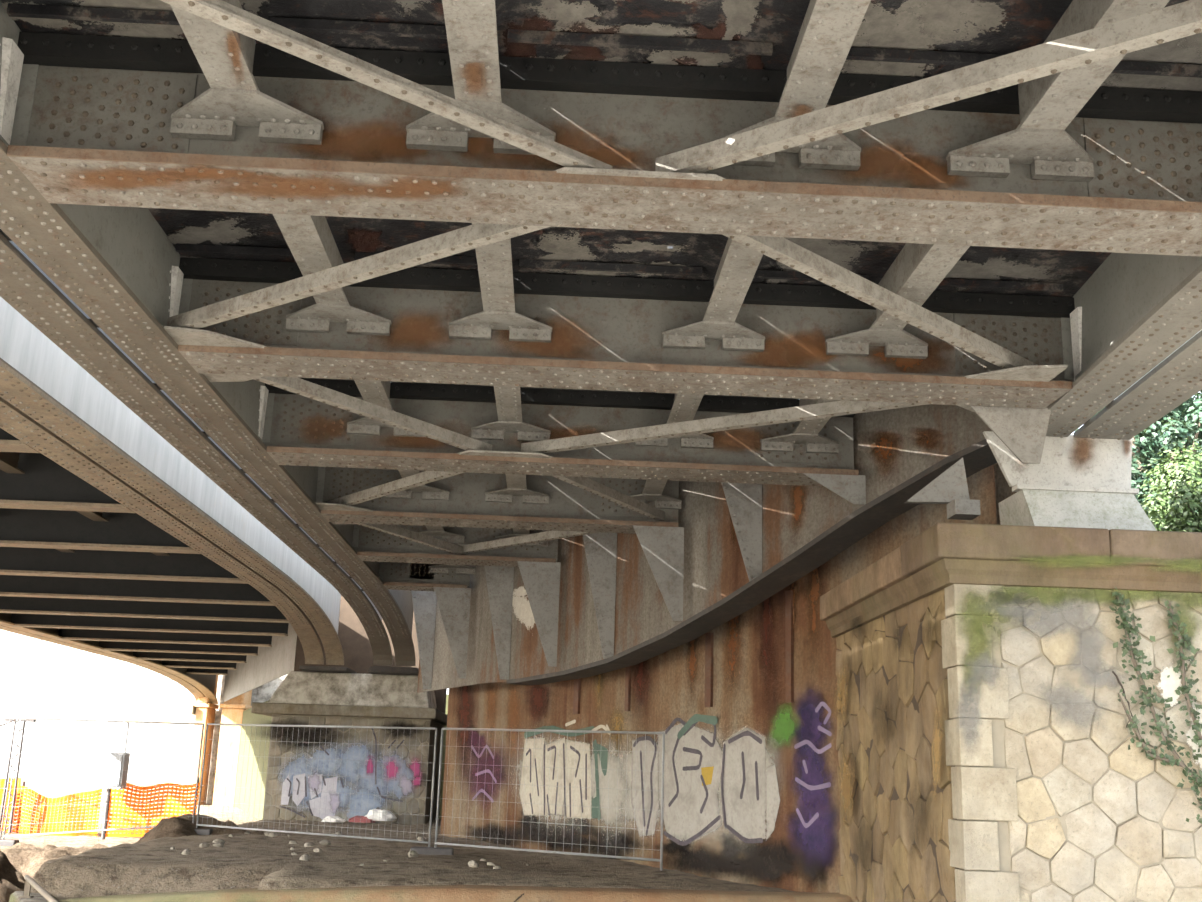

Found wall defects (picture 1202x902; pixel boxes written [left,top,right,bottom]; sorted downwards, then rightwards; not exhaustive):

peeling [239,0,270,15]
peeling [394,0,435,18]
peeling [502,0,765,69]
rust [298,124,426,160]
rust [69,167,456,198]
peeling [534,230,691,278]
peeling [783,237,877,272]
rust [503,322,588,357]
rust [748,334,834,368]
rust [868,341,950,373]
leakage [992,597,1120,687]
rust [456,685,473,773]